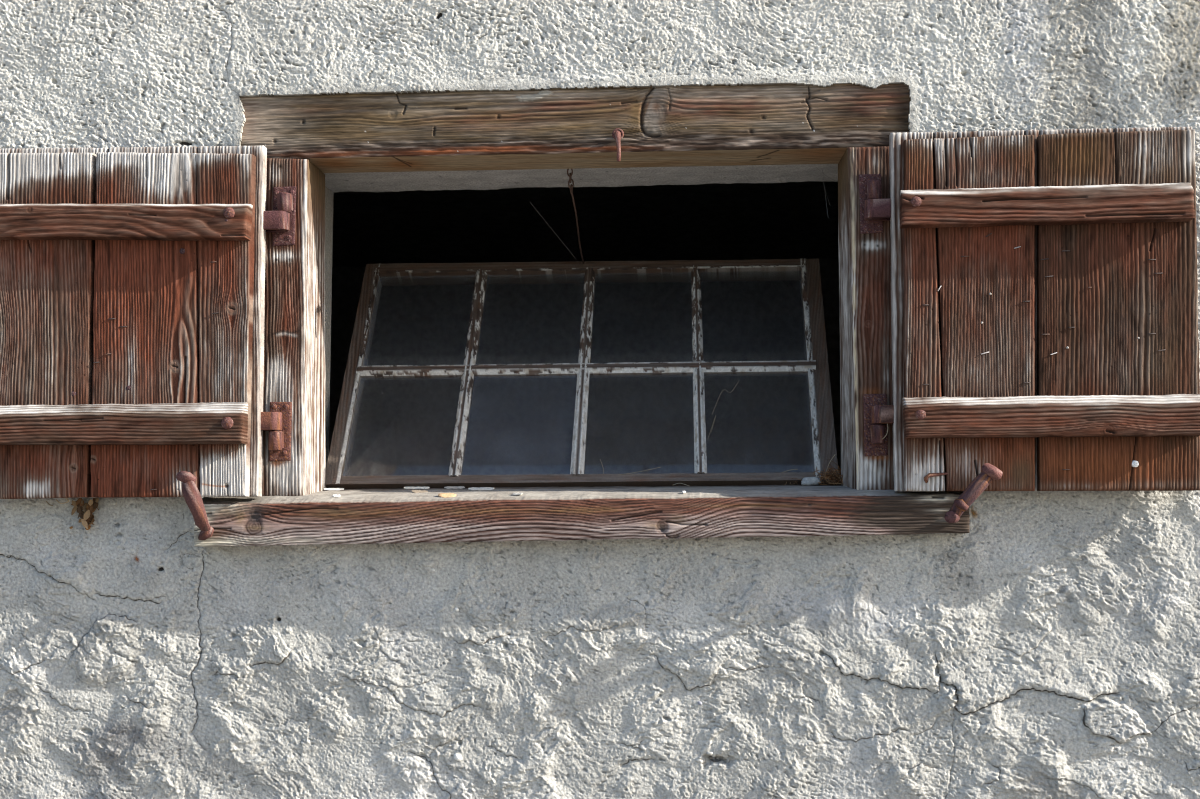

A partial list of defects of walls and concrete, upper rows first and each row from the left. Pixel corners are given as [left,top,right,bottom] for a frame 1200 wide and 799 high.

crack [0,554,165,711]
crack [342,629,522,799]
crack [627,598,768,691]
crack [811,654,1119,799]